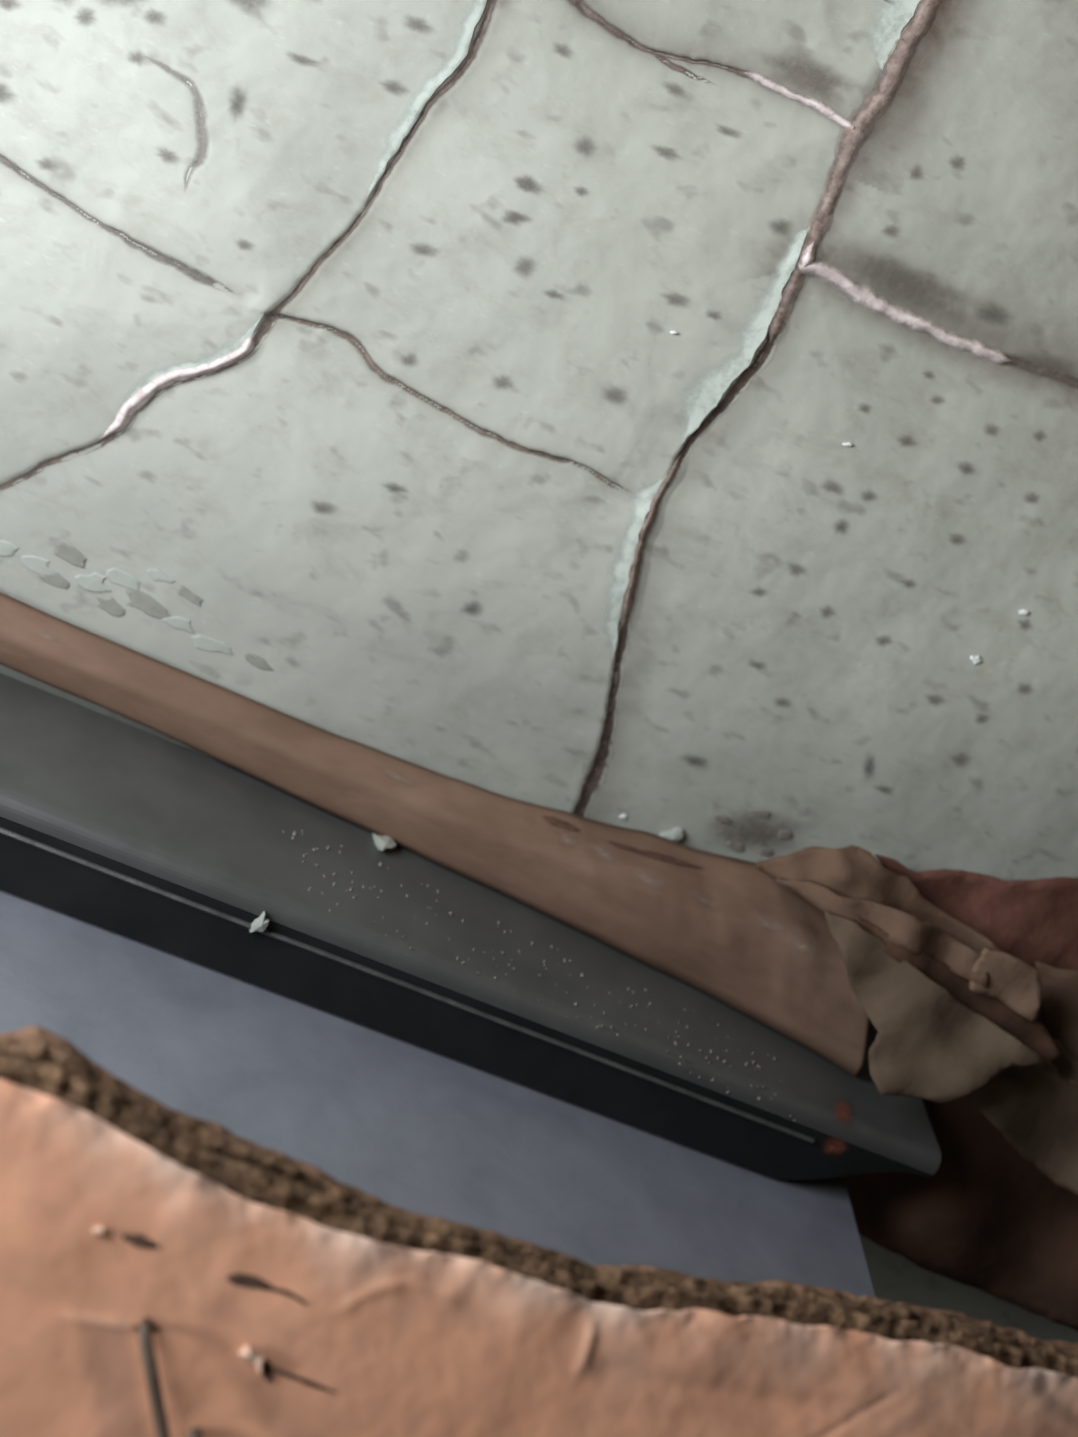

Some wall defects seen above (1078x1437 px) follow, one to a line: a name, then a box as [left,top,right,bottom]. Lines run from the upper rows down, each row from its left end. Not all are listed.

crack [0,0,1078,817]